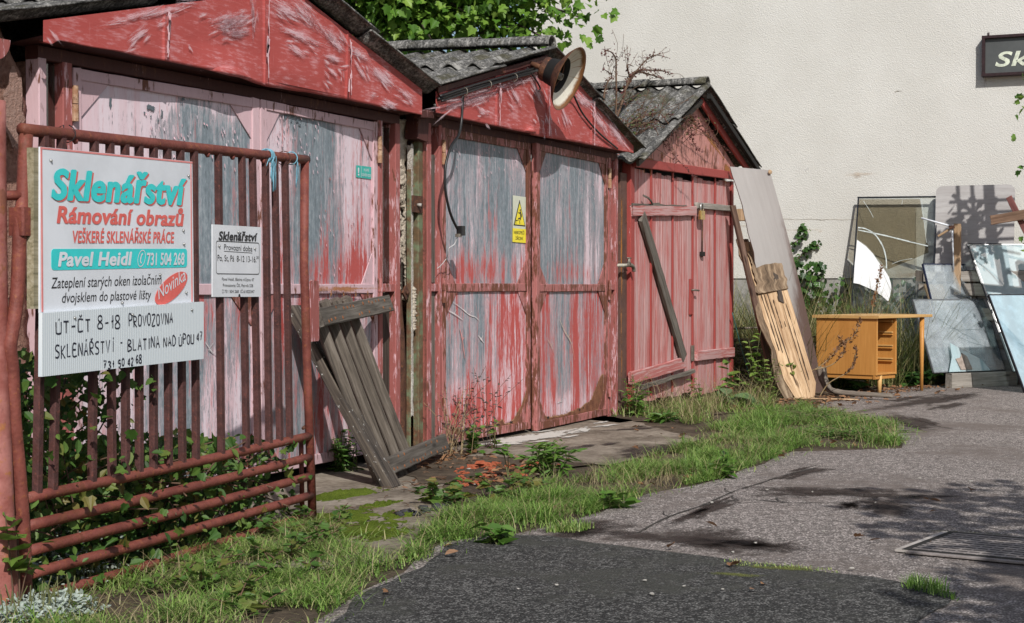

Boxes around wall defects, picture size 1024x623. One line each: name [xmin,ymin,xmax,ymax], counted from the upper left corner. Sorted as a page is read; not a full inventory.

peeling [106,2,192,57]
peeling [200,0,413,109]
peeling [277,114,319,174]
peeling [430,69,572,138]
peeling [577,93,628,148]